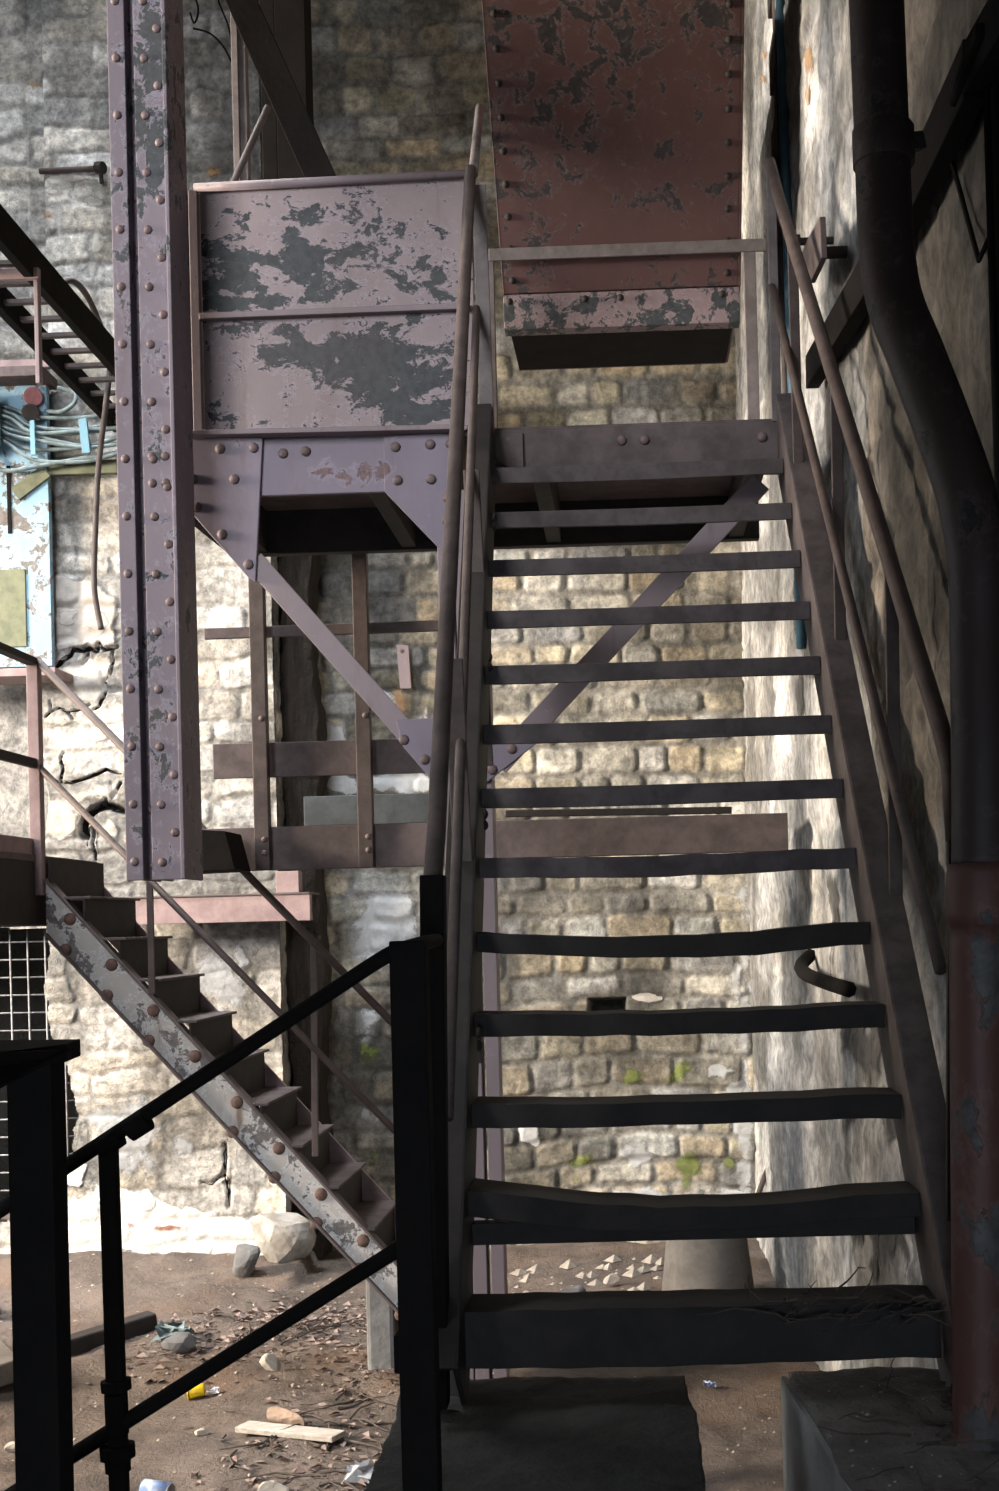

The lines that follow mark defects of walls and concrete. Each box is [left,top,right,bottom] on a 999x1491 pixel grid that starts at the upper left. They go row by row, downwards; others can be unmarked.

crack [46,642,116,719]
crack [57,754,125,860]
peeling [67,1164,101,1253]
peeling [120,1186,263,1256]